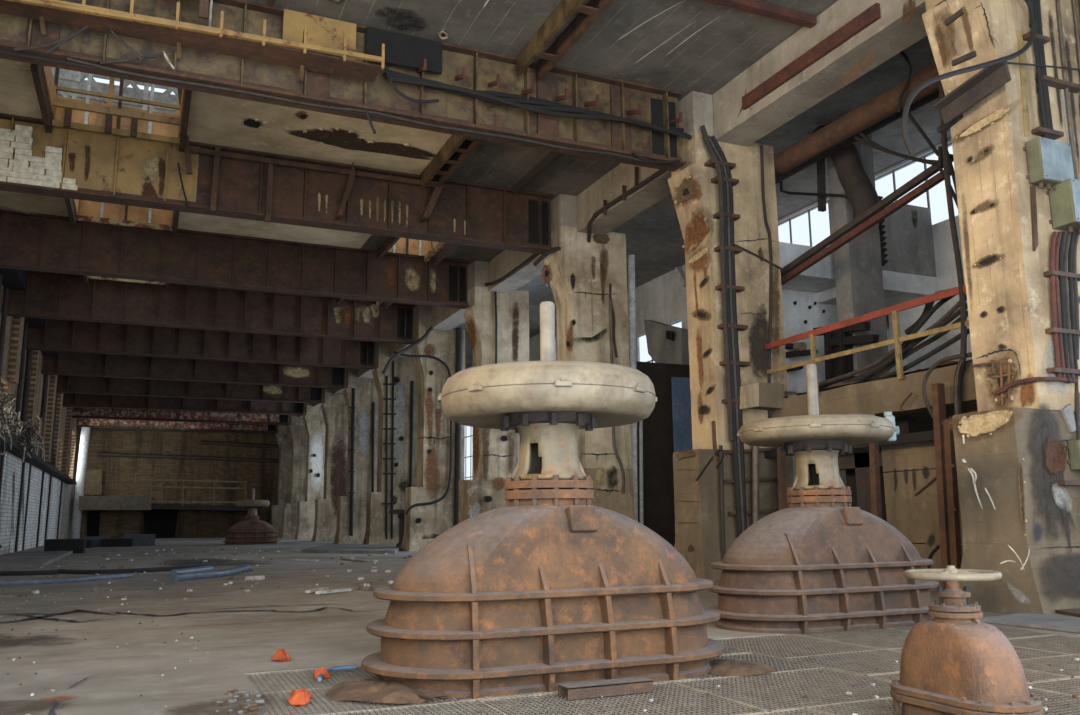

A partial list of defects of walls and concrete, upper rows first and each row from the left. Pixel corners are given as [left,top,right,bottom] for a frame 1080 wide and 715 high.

spalling [674,176,713,265]
rust [691,250,710,310]
crack [0,601,388,623]
crack [48,676,91,715]